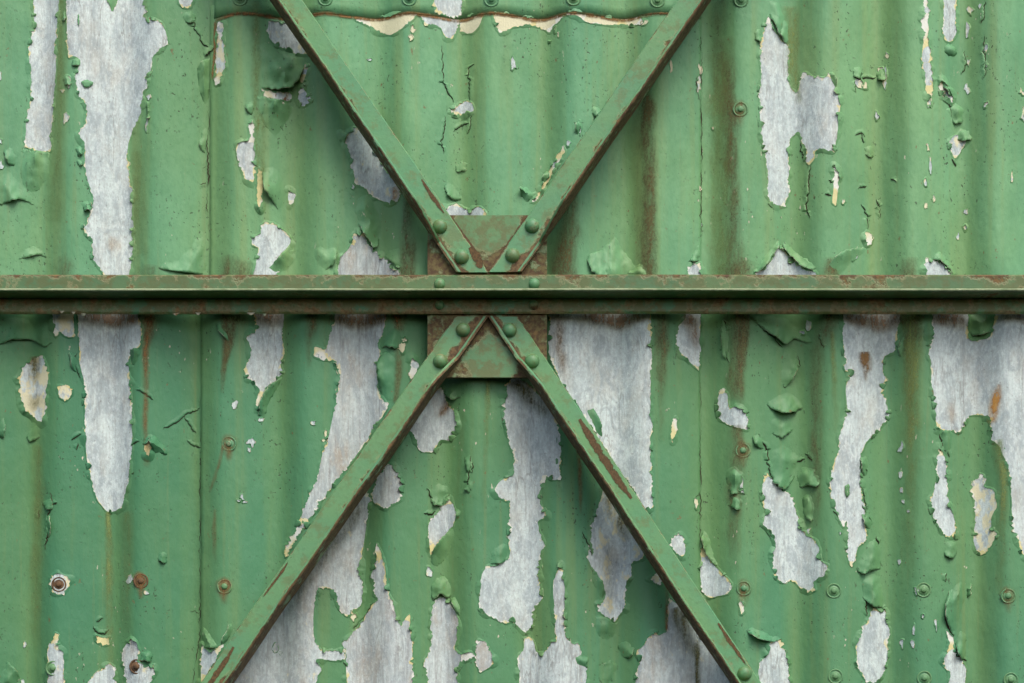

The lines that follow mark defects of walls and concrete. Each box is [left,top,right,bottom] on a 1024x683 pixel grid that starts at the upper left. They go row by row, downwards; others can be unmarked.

peeling [0,0,169,275]
crack [436,46,475,153]
corrosion [724,70,742,227]
corrosion [469,247,483,268]
peeling [234,461,499,683]
peeling [475,379,591,683]
peeling [547,314,656,514]
corrosion [578,418,632,499]
peeling [714,314,974,683]
corrosion [860,352,870,371]
peeling [923,314,1024,562]
corrosion [990,392,1000,421]